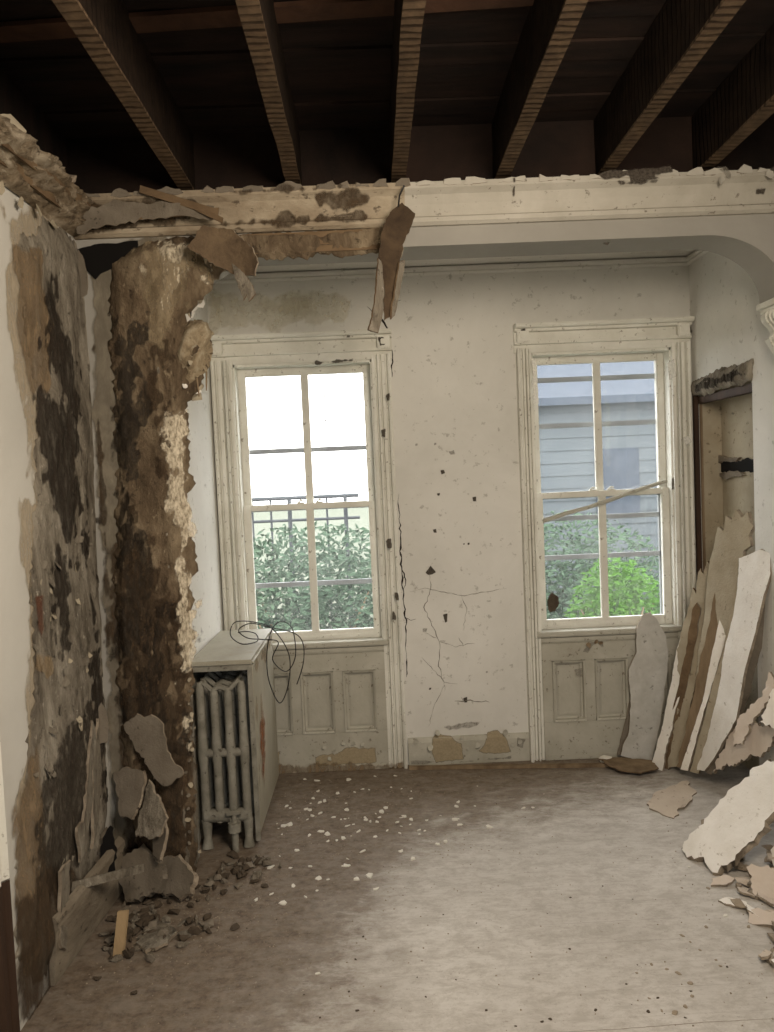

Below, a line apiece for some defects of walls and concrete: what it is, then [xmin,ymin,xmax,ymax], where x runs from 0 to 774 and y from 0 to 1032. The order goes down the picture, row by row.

flaking render [499,164,774,194]
leakage [4,207,198,1019]
flaking render [0,115,487,986]
crack [398,498,507,719]
peeling [414,722,524,764]